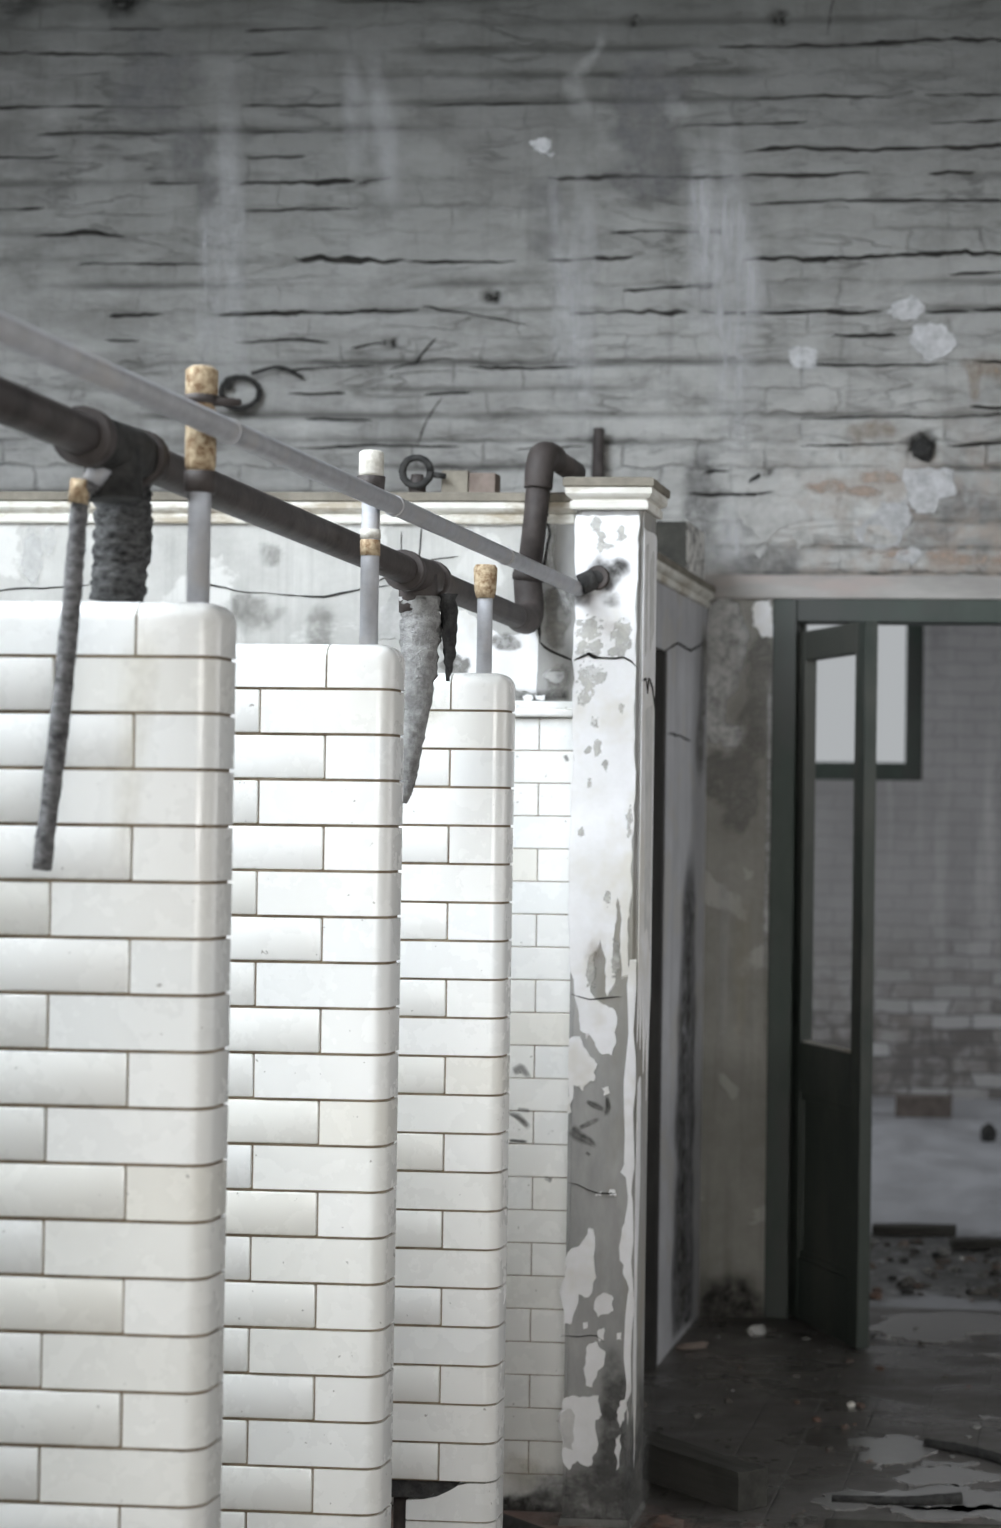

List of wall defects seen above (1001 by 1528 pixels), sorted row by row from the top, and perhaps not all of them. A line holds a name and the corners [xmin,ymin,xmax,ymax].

crack [718,0,1001,49]
crack [0,105,186,159]
crack [239,104,391,212]
crack [0,207,200,266]
crack [294,93,1001,367]
crack [105,312,162,342]
peeling [887,294,957,363]
crack [210,306,577,449]
crack [799,405,1001,447]
crack [688,470,773,497]
damp [698,635,773,833]
peeling [558,515,657,1470]